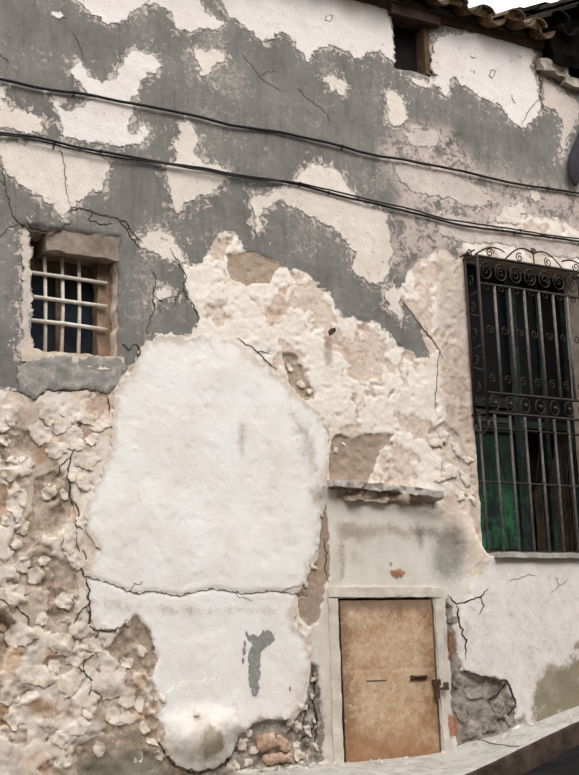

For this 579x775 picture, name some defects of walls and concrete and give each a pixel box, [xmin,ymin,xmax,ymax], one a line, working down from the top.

crack [17,388,111,410]
crack [0,148,143,248]
peeling [0,49,164,219]
crack [122,248,200,361]
peeling [165,119,229,214]
peeling [76,0,396,65]
peeling [248,163,406,322]
crack [403,303,443,413]
peeling [408,32,579,161]
spalling [0,406,167,775]
crack [56,449,307,695]
crack [448,590,516,721]